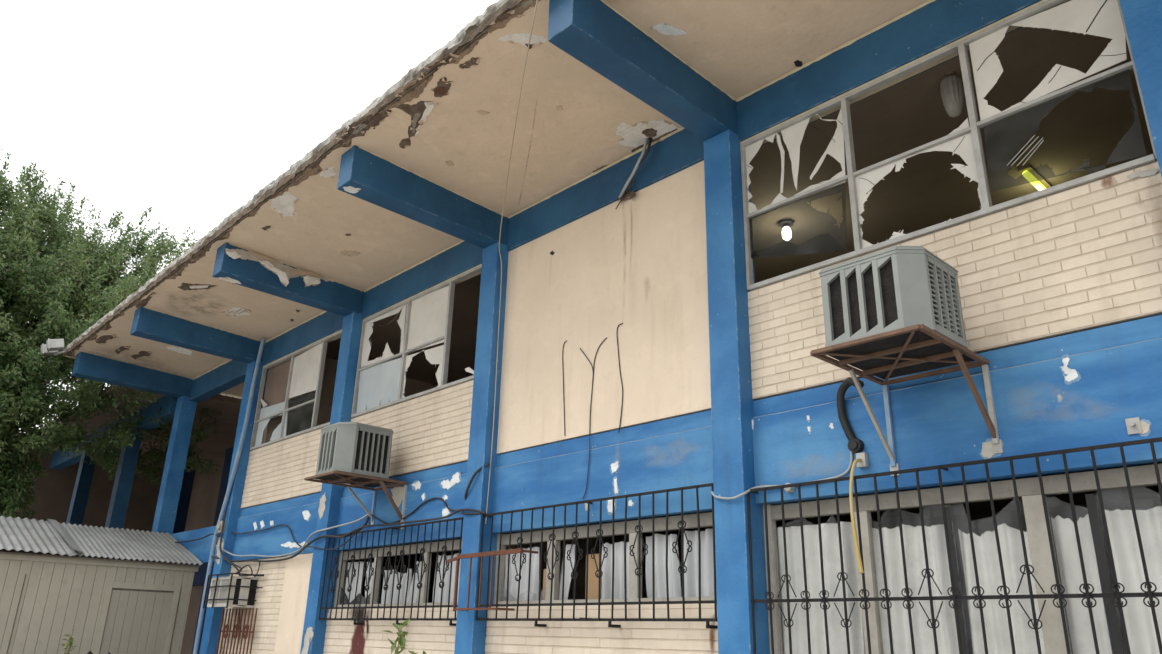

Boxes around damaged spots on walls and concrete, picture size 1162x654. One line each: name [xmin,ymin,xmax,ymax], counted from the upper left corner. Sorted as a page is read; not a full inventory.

peeling [615,120,679,148]
spalling [66,0,547,361]
peeling [1053,354,1081,403]
peeling [974,438,1004,459]
peeling [1138,419,1151,437]
peeling [391,480,426,507]
peeling [439,471,462,519]
peeling [606,458,635,515]
corrosion [350,606,368,654]